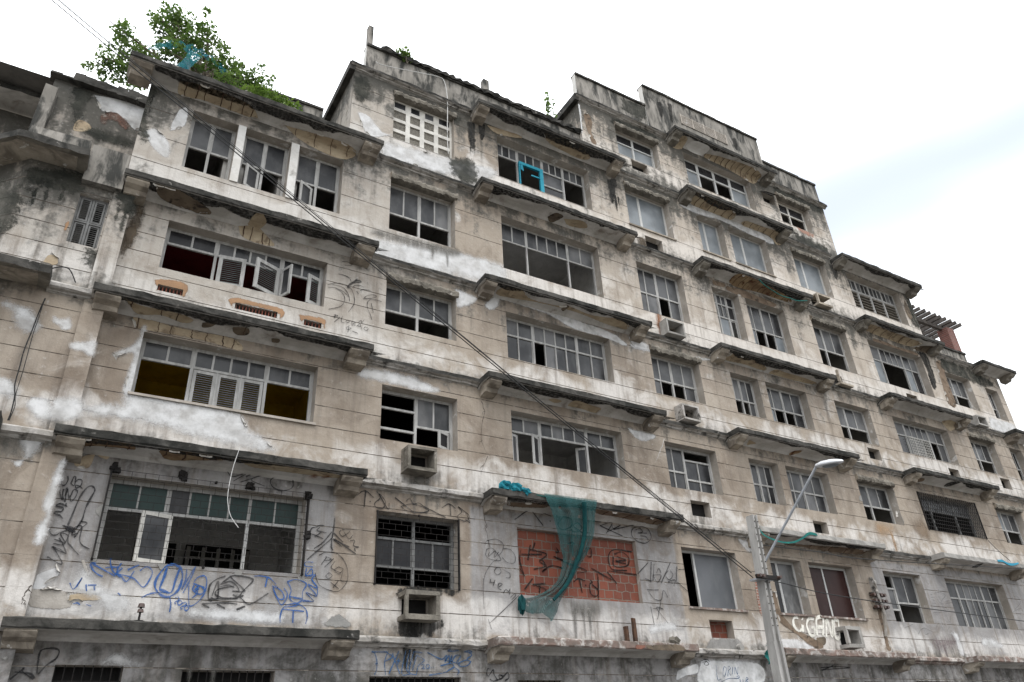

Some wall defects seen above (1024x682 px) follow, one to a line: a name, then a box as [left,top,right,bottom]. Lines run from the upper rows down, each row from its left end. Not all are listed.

water stain [0,167,85,233]
spalling [73,81,259,157]
spalling [153,183,211,215]
spalling [239,213,274,246]
water stain [114,174,459,264]
spalling [285,125,358,159]
water stain [449,103,647,246]
spalling [673,136,761,184]
spalling [713,274,792,302]
water stain [848,258,995,389]